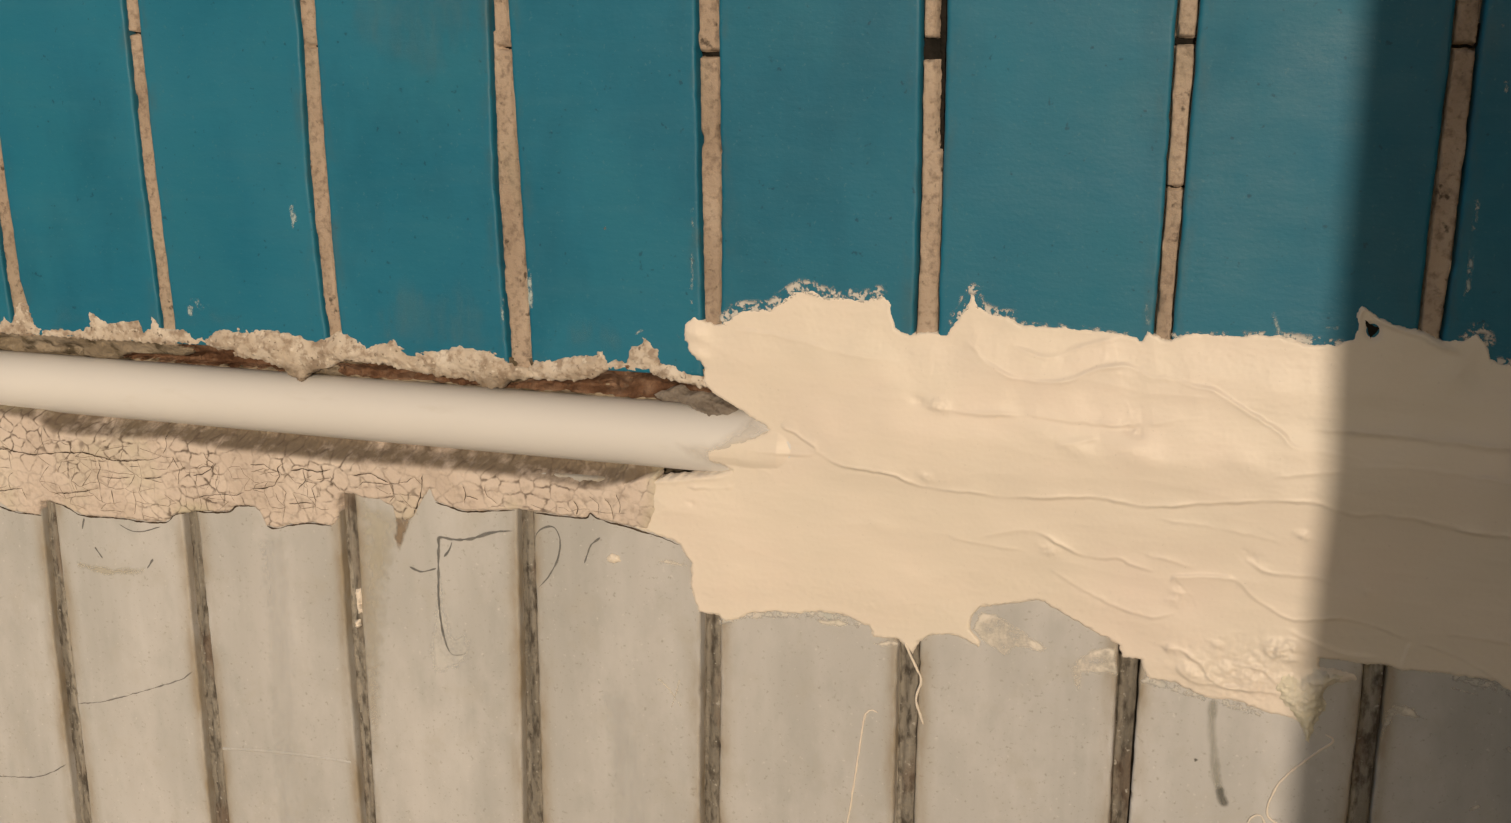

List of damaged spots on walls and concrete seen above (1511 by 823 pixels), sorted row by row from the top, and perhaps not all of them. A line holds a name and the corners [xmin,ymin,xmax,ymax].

spalling [0,302,739,417]
crack [0,427,423,519]
flaking render [0,405,664,528]
crack [533,495,621,519]